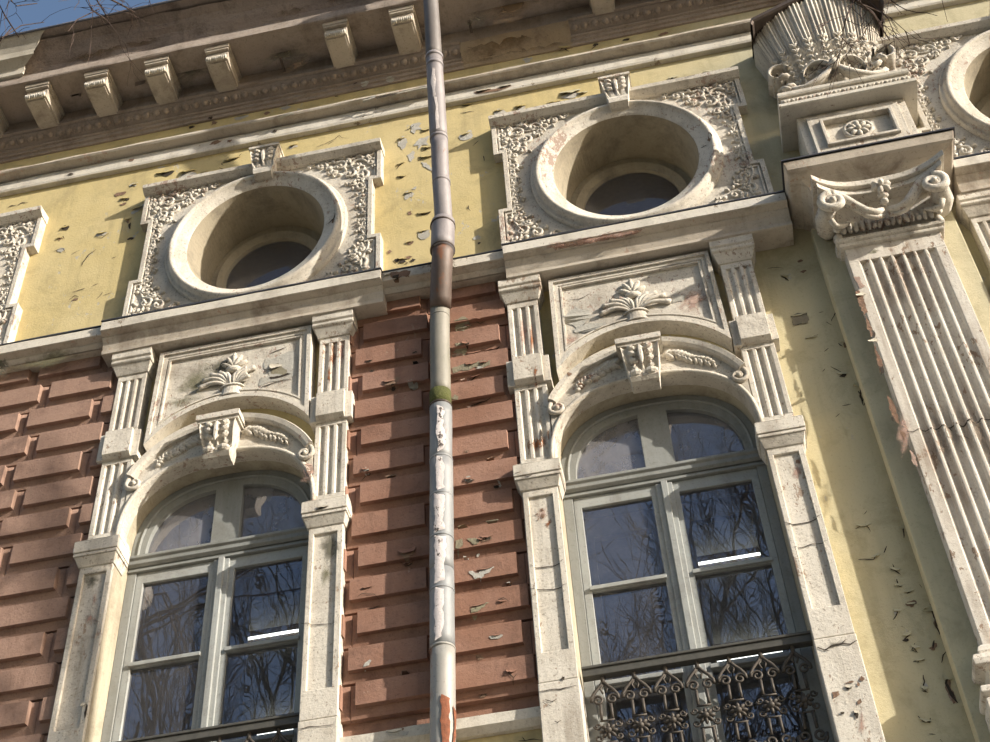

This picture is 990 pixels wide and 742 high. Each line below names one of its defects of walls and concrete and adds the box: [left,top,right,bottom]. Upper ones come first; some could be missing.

peeling [547,89,588,104]
peeling [363,68,440,178]
peeling [114,182,144,240]
peeling [404,186,432,215]
spalling [384,229,430,283]
spalling [791,313,809,327]
crack [908,418,990,432]
peeling [433,405,498,640]
spalling [832,676,864,699]
spalling [902,630,958,704]
rust [440,694,456,742]